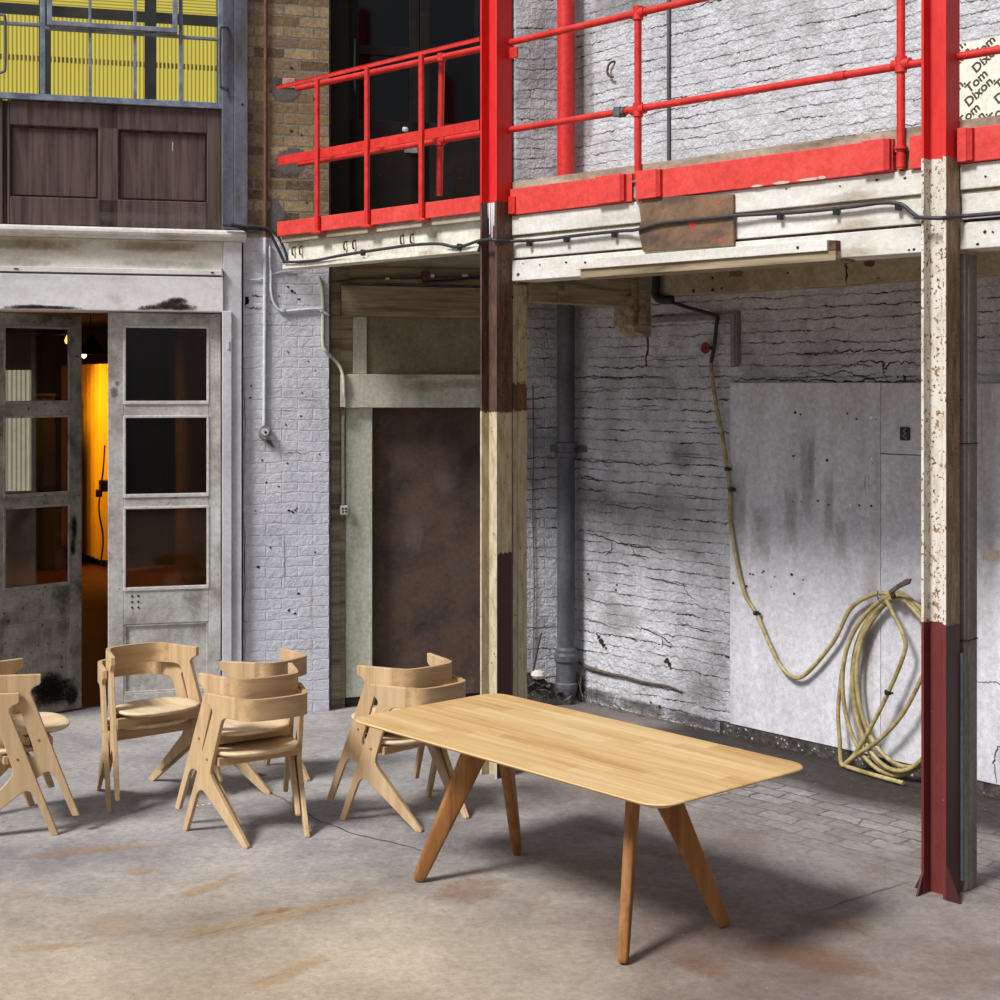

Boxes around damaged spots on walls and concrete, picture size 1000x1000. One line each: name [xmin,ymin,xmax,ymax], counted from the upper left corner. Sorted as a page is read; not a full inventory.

crack [734,348,921,383]
crack [579,358,718,429]
crack [579,456,716,511]
crack [579,530,695,600]
crack [579,595,714,646]